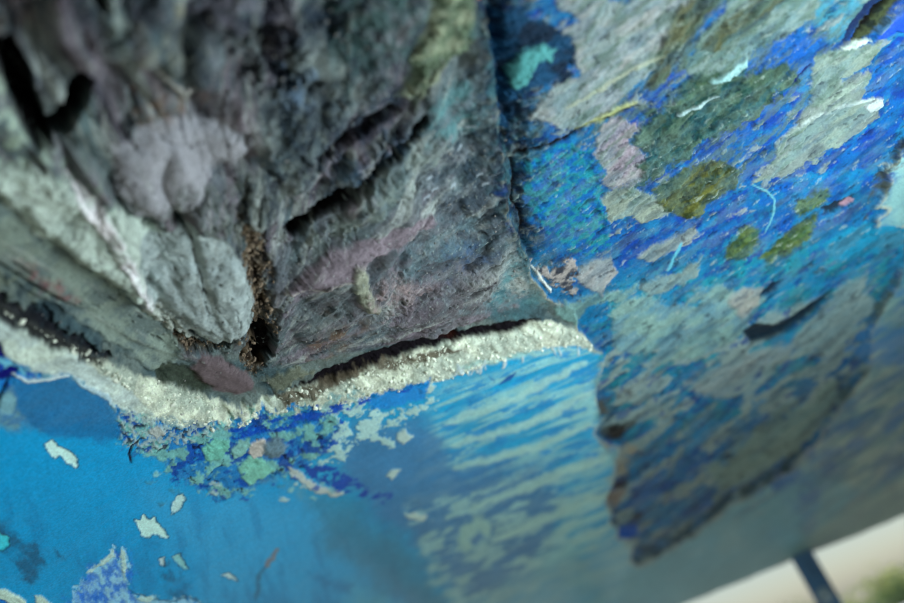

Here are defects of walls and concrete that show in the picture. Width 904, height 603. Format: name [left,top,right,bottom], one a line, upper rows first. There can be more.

peeling [791,0,904,82]
crack [842,0,902,51]
peeling [605,0,729,159]
peeling [712,61,757,85]
spalling [0,0,596,504]
peeling [504,68,904,566]
peeling [0,534,11,551]
peeling [136,515,170,539]
peeling [172,495,186,513]
peeling [405,512,429,521]